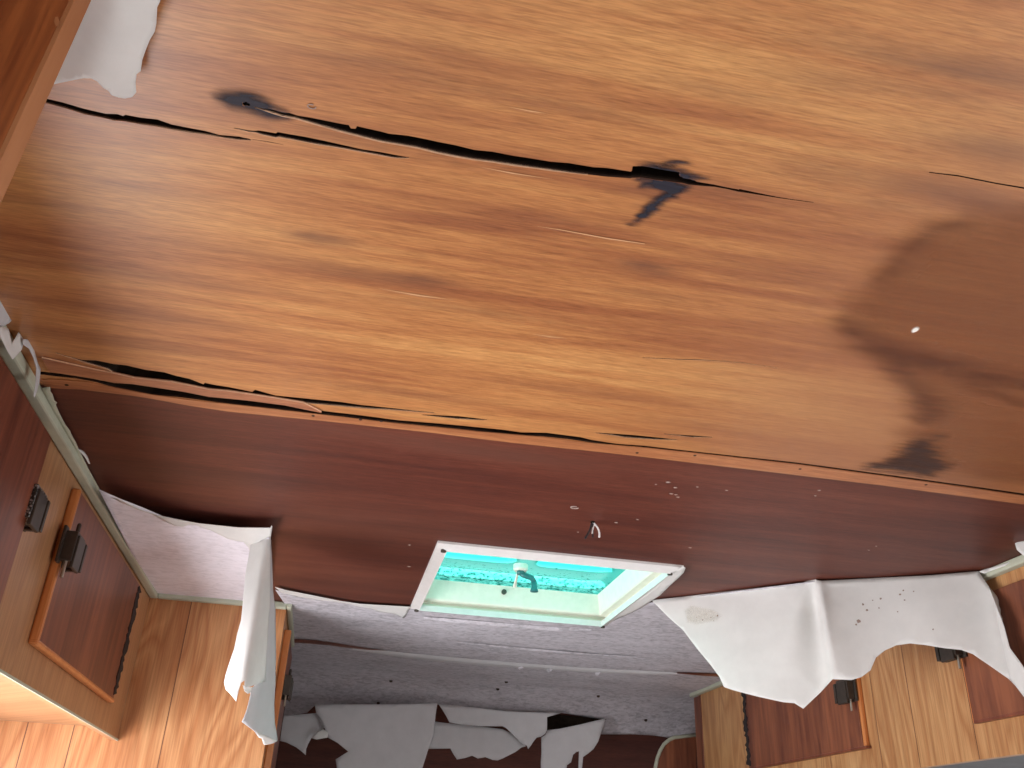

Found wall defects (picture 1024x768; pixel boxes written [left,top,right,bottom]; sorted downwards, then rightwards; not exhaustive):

water stain [216,92,289,119]
crack [46,99,814,203]
water stain [630,161,704,225]
crack [40,353,1024,495]
water stain [870,441,945,476]